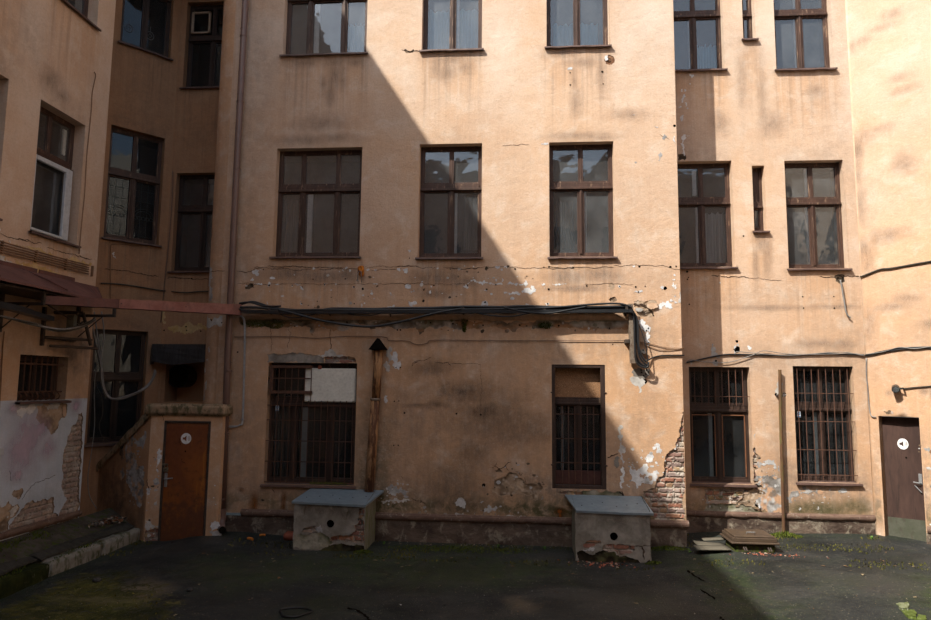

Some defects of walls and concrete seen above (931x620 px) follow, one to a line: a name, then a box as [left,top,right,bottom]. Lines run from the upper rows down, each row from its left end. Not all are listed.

flaking render [397,250,562,307]
peeling [239,317,628,336]
flaking render [630,266,690,393]
peeling [16,403,67,435]
flaking render [0,413,83,540]
peeling [119,431,162,541]
flaking render [381,462,545,516]
flaking render [558,412,685,520]
peeling [702,447,851,513]
flaking render [577,540,651,563]